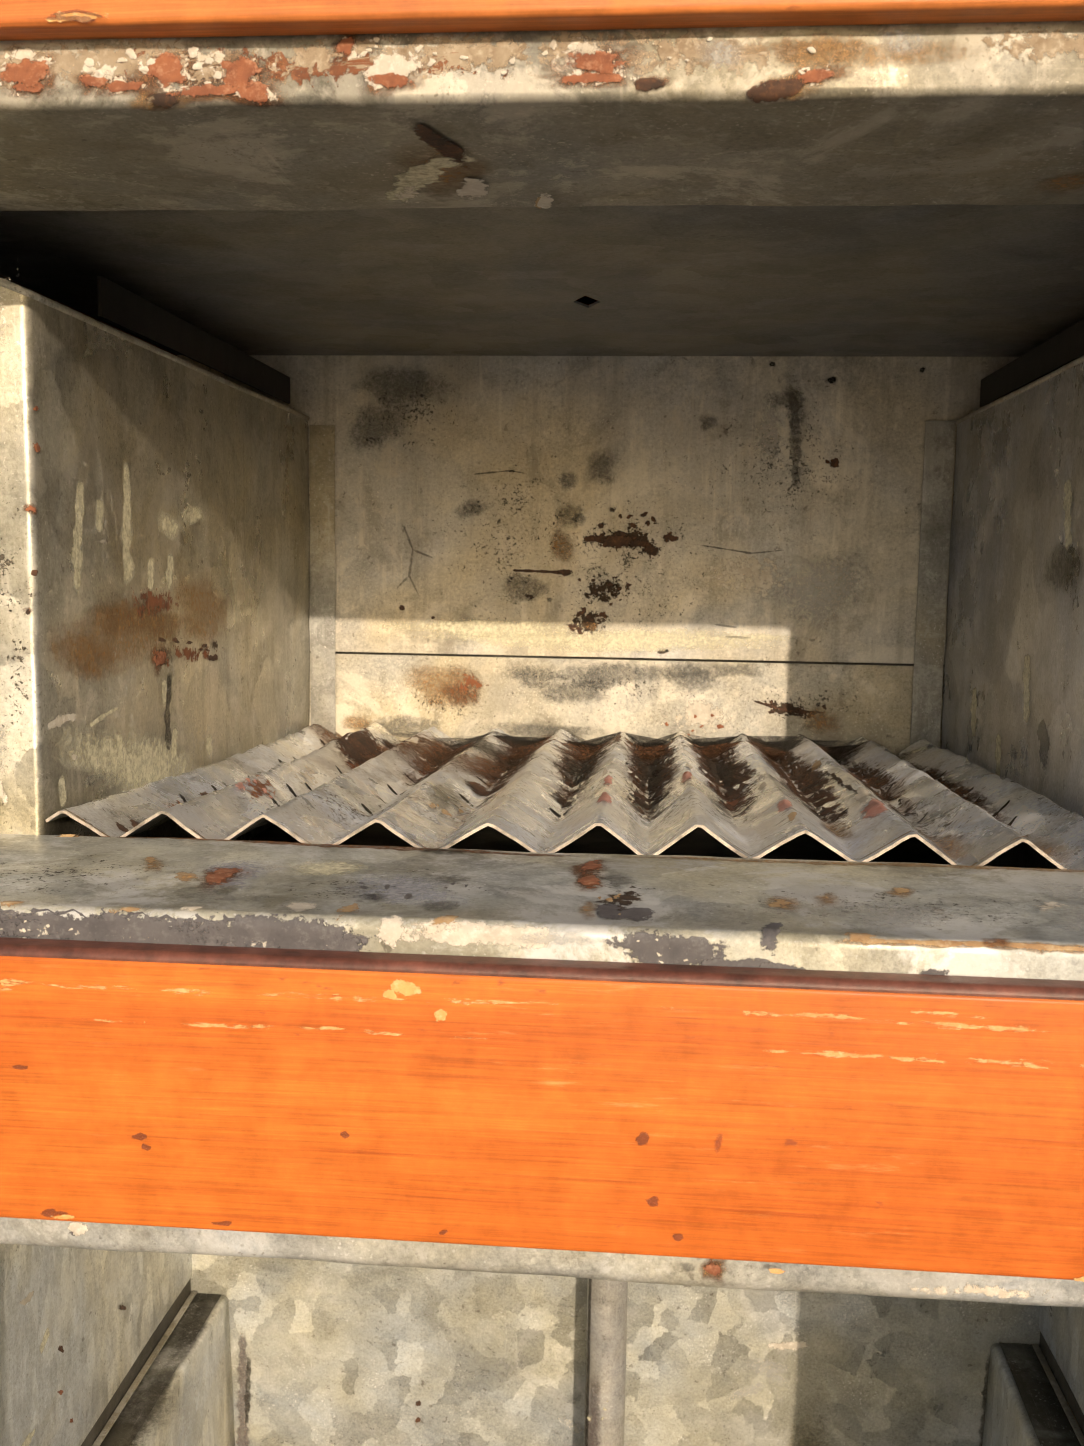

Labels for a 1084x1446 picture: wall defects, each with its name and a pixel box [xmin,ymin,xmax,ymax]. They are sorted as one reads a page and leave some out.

spalling [47,11,108,22]
peeling [0,28,942,89]
water stain [775,393,803,484]
corrosion [151,637,223,673]
corrosion [426,433,1064,866]
corrosion [294,669,579,817]
corrosion [200,773,275,801]
corrosion [576,860,604,916]
peeling [0,901,376,952]
peeling [432,915,460,926]